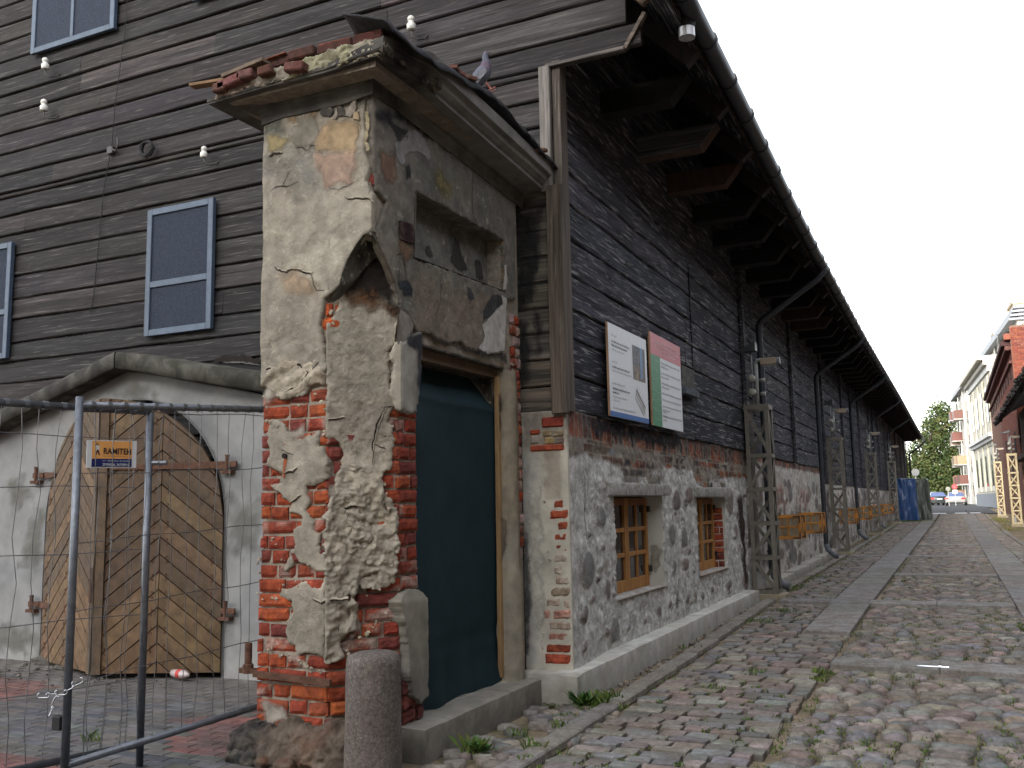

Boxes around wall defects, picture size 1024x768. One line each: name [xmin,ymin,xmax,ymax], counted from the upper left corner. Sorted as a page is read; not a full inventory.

crack [269,145,316,189]
peeling [394,129,431,165]
crack [275,267,323,291]
crack [328,406,395,465]
spalling [256,385,418,726]
spalling [541,500,573,664]
spalling [401,681,424,725]